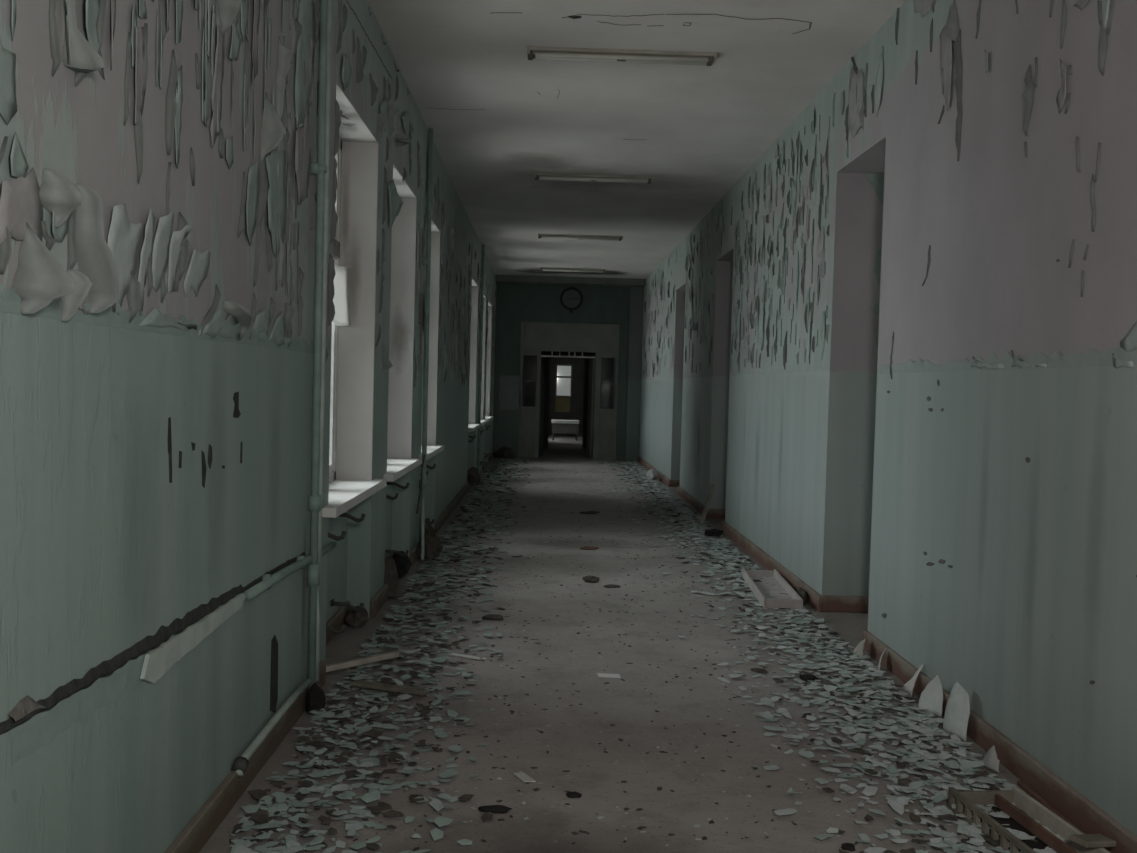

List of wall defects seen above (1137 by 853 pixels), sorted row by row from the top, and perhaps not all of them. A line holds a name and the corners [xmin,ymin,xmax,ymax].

crack [577,14,812,34]
peeling [913,0,963,161]
peeling [1049,0,1115,114]
peeling [0,0,331,365]
peeling [328,0,496,389]
peeling [731,8,899,372]
peeling [643,222,717,378]
spalling [168,417,225,488]
spalling [140,593,246,684]
spalling [270,635,278,713]
peeling [900,663,970,741]
peeling [983,745,1000,773]